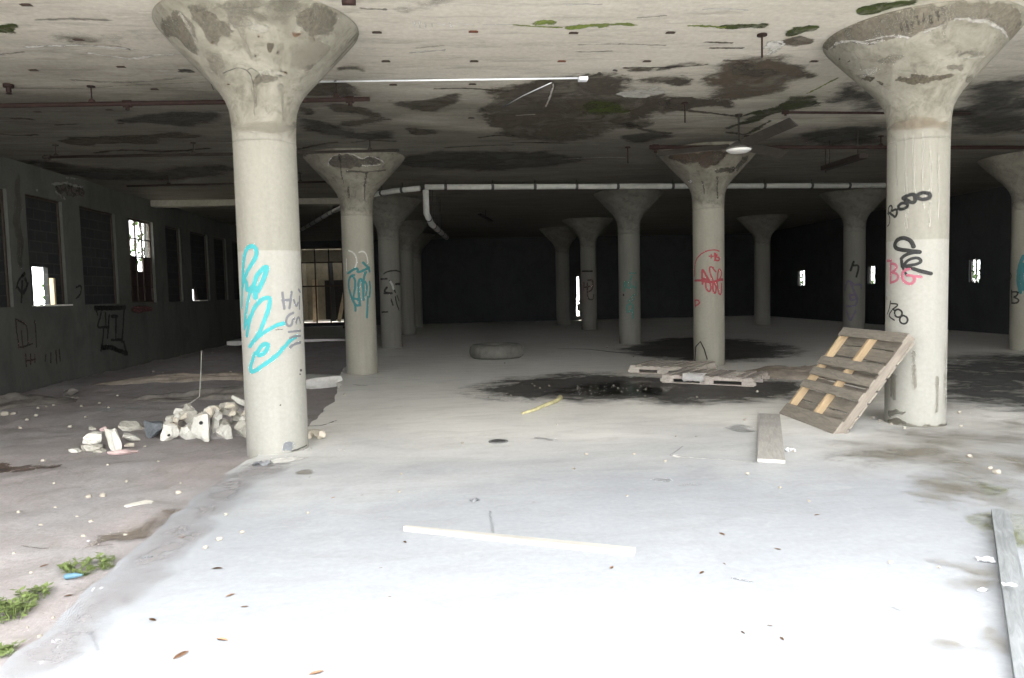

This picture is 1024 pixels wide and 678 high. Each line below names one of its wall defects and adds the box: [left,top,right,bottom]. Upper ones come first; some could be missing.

peeling [161,7,235,54]
peeling [250,24,279,57]
peeling [293,2,337,36]
peeling [823,0,1022,50]
spalling [253,70,286,86]
damp [245,33,396,150]
damp [396,41,817,171]
spalling [861,67,953,85]
damp [947,65,1024,134]
peeling [327,153,386,200]
damp [476,372,801,405]